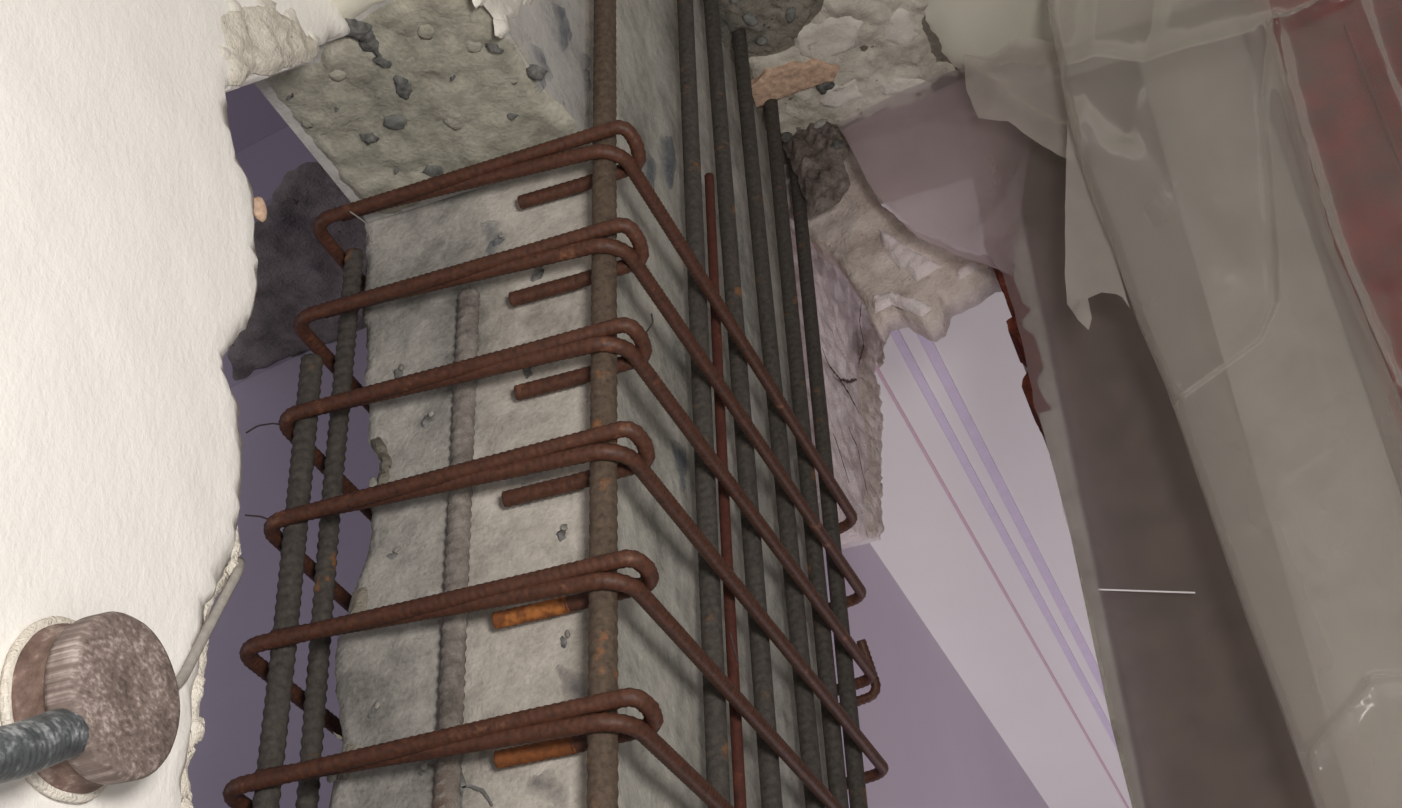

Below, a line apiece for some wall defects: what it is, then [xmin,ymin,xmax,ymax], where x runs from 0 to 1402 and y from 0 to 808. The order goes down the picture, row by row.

spalling [252,772,352,808]
spalling [217,0,618,770]
spalling [586,732,619,808]
flaking render [677,0,1052,808]